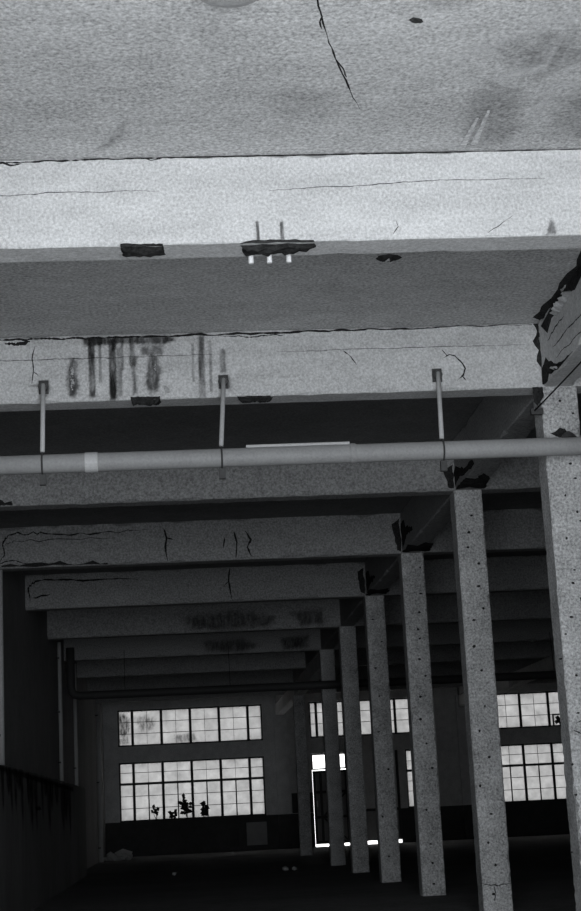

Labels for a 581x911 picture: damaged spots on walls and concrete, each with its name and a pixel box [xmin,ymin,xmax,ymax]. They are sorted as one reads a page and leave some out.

crack [317,0,360,109]
leakage [84,336,173,399]
crack [0,315,581,381]
spalling [532,251,581,406]
spalling [443,460,490,489]
crack [223,531,252,599]
spalling [358,568,389,596]
spalling [391,519,433,552]